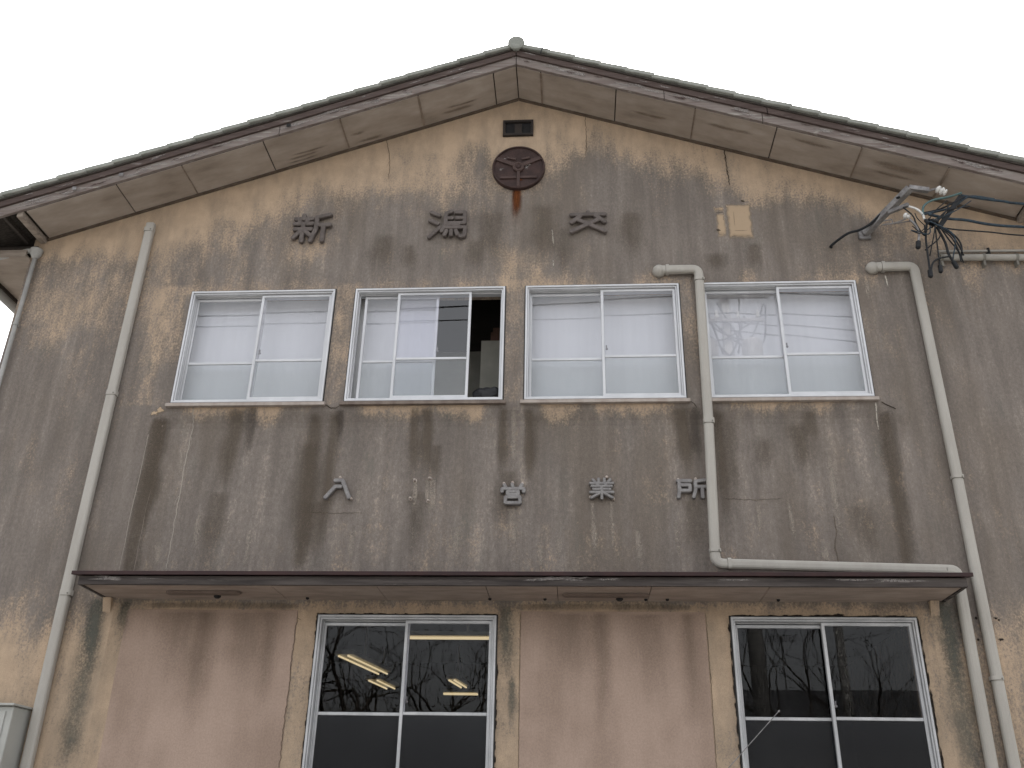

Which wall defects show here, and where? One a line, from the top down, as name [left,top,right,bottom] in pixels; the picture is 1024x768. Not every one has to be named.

leakage [125,420,165,571]
crack [166,408,197,568]
leakage [499,411,532,462]
leakage [713,414,726,487]
leakage [65,601,103,749]